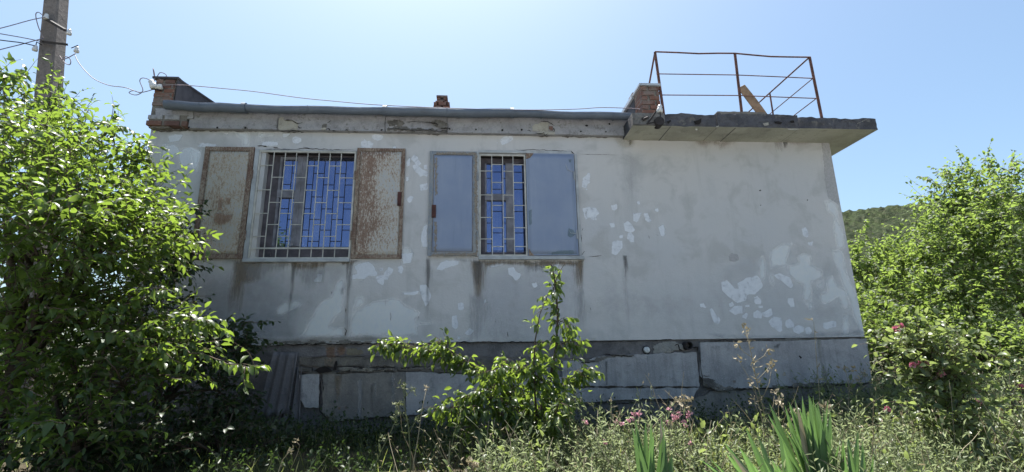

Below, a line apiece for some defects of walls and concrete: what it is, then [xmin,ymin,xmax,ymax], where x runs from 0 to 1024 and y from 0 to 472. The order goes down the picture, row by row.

spalling [361,120,450,148]
peeling [609,201,665,255]
peeling [352,253,412,294]
peeling [700,273,836,342]